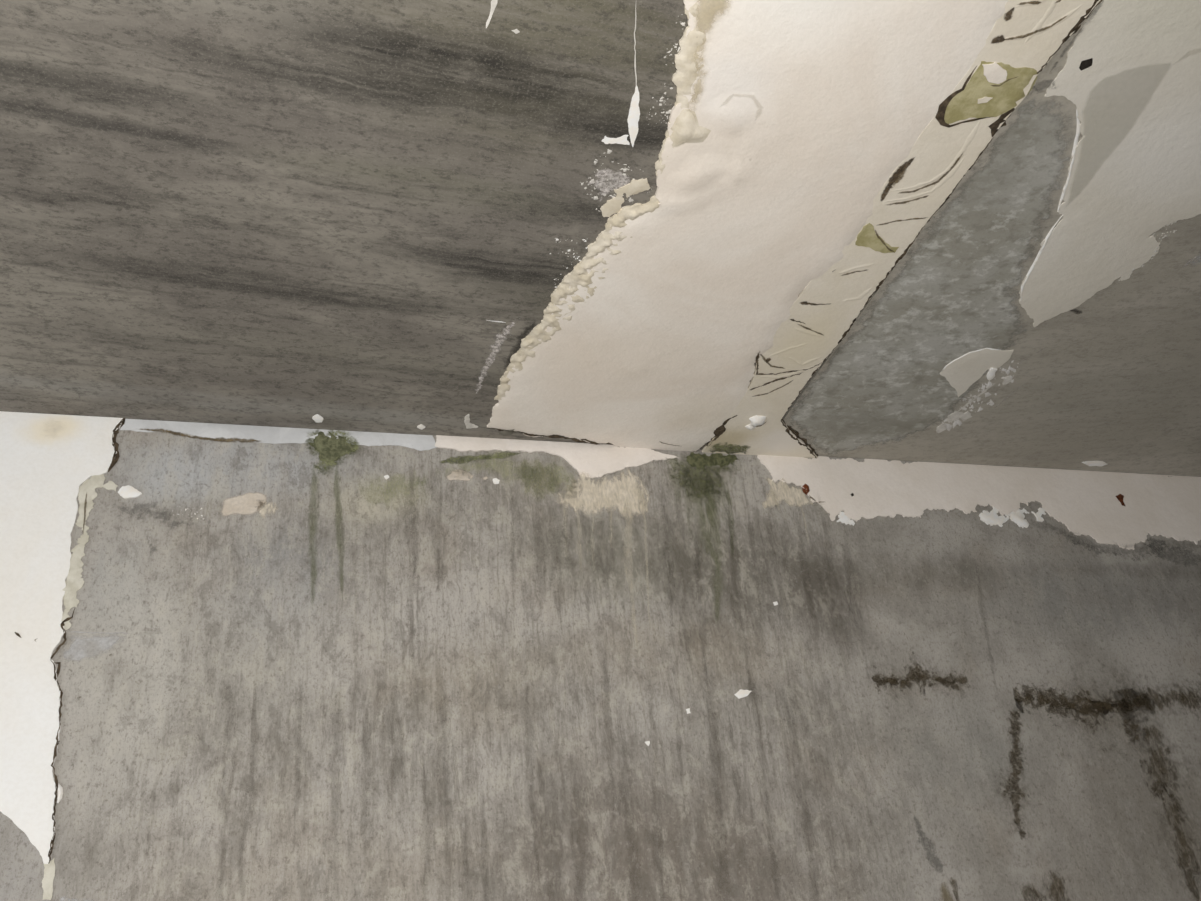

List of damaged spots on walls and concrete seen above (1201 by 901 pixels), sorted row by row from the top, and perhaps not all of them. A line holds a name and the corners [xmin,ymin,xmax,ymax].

peeling [487,0,1201,550]
crack [661,0,1103,458]
water stain [559,470,649,517]
water stain [763,478,809,508]
peeling [0,411,142,900]
mould [872,653,967,691]
water stain [1004,683,1199,837]